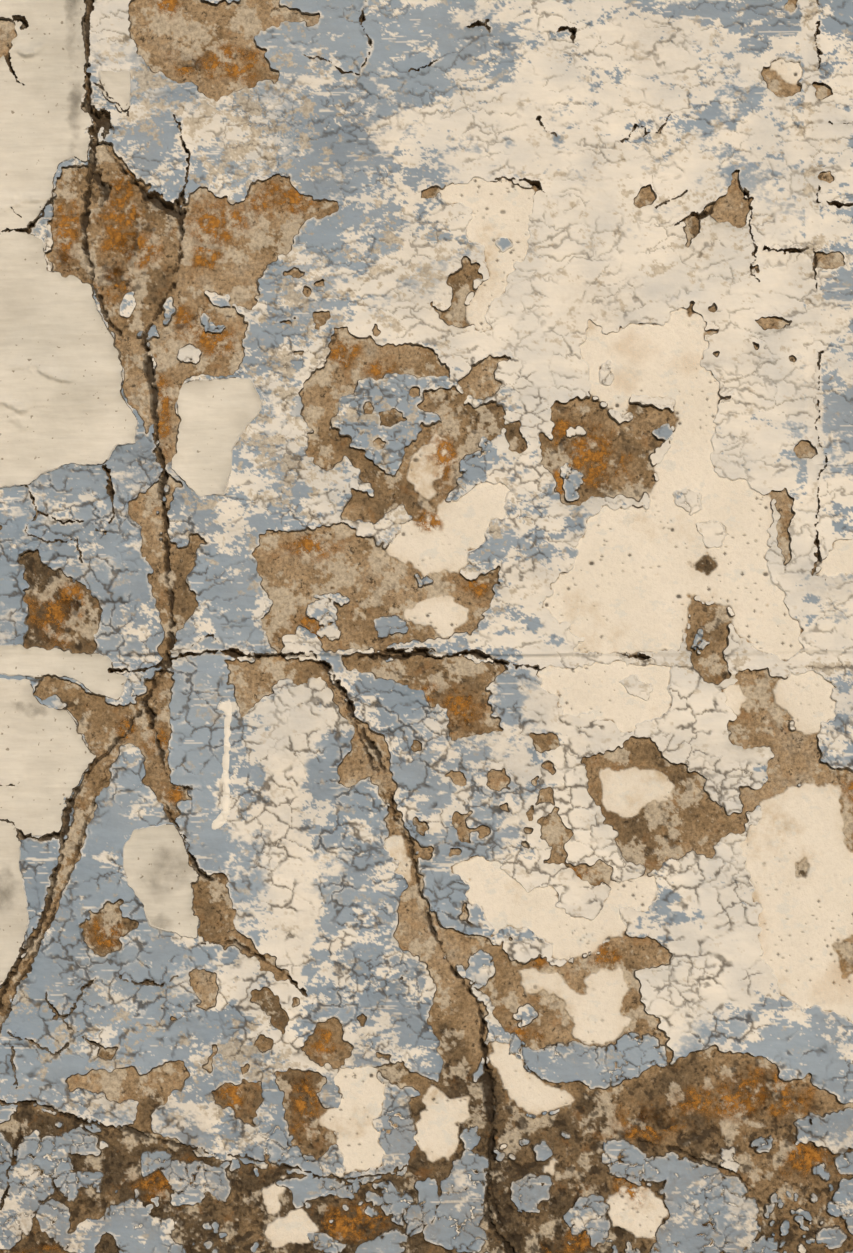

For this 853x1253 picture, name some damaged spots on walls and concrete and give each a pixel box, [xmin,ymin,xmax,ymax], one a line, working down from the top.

peeling [129,0,320,102]
flaking render [422,178,541,332]
peeling [634,185,655,208]
peeling [677,170,753,247]
peeling [818,172,834,190]
peeling [813,249,845,269]
spalling [0,134,339,1027]
crack [0,0,542,1253]
crack [629,652,650,660]
flaking render [0,302,853,1253]